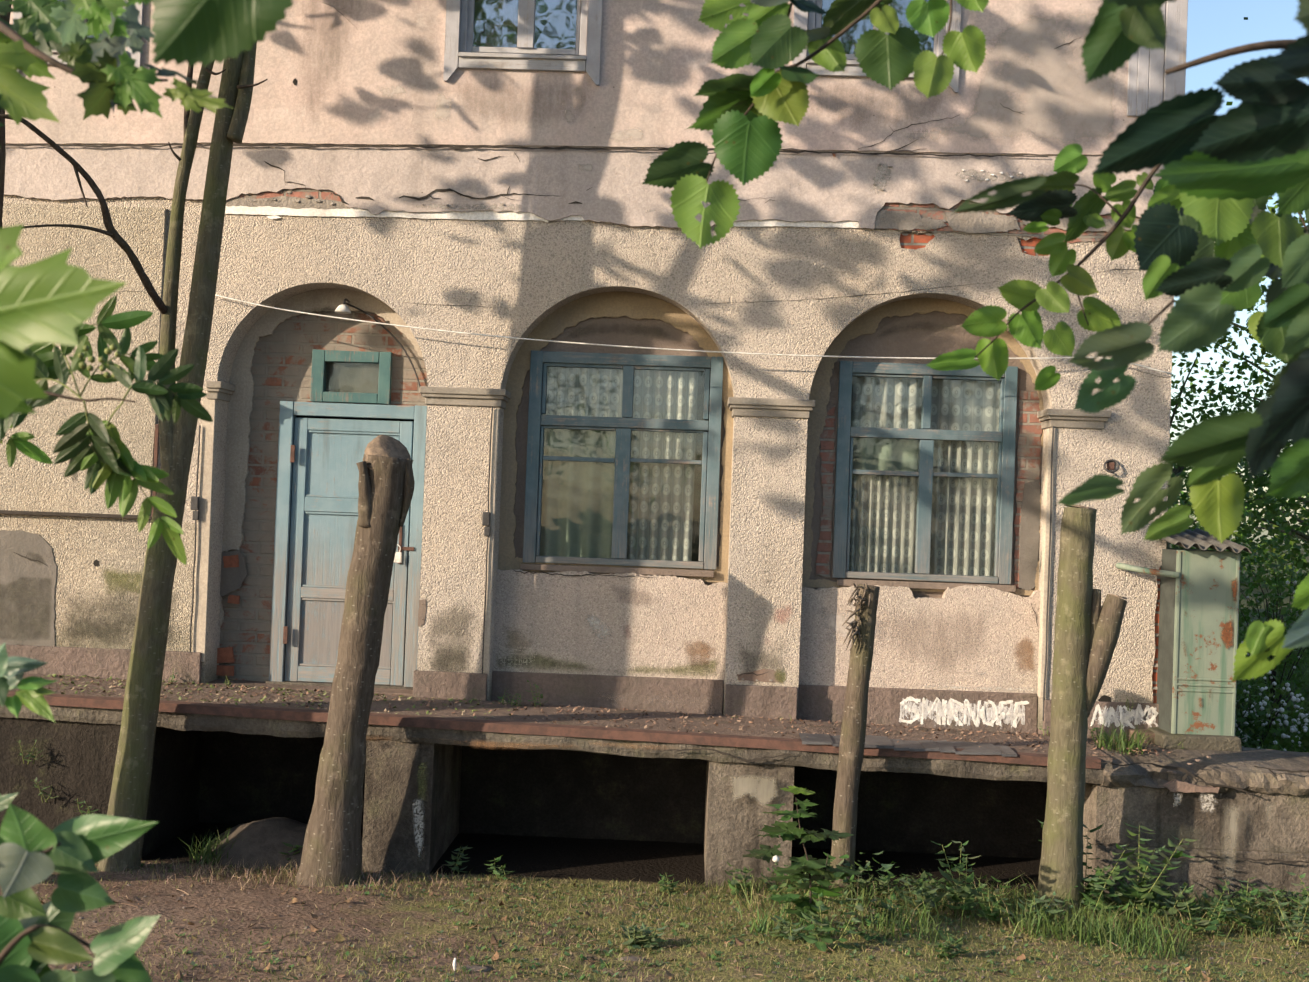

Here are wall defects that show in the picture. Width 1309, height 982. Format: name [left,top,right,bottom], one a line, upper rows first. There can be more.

crack [779,115,1048,157]
crack [6,143,669,205]
flaking render [225,188,584,223]
flaking render [733,163,1141,256]
flaking render [220,550,248,604]
rust [1221,621,1233,649]